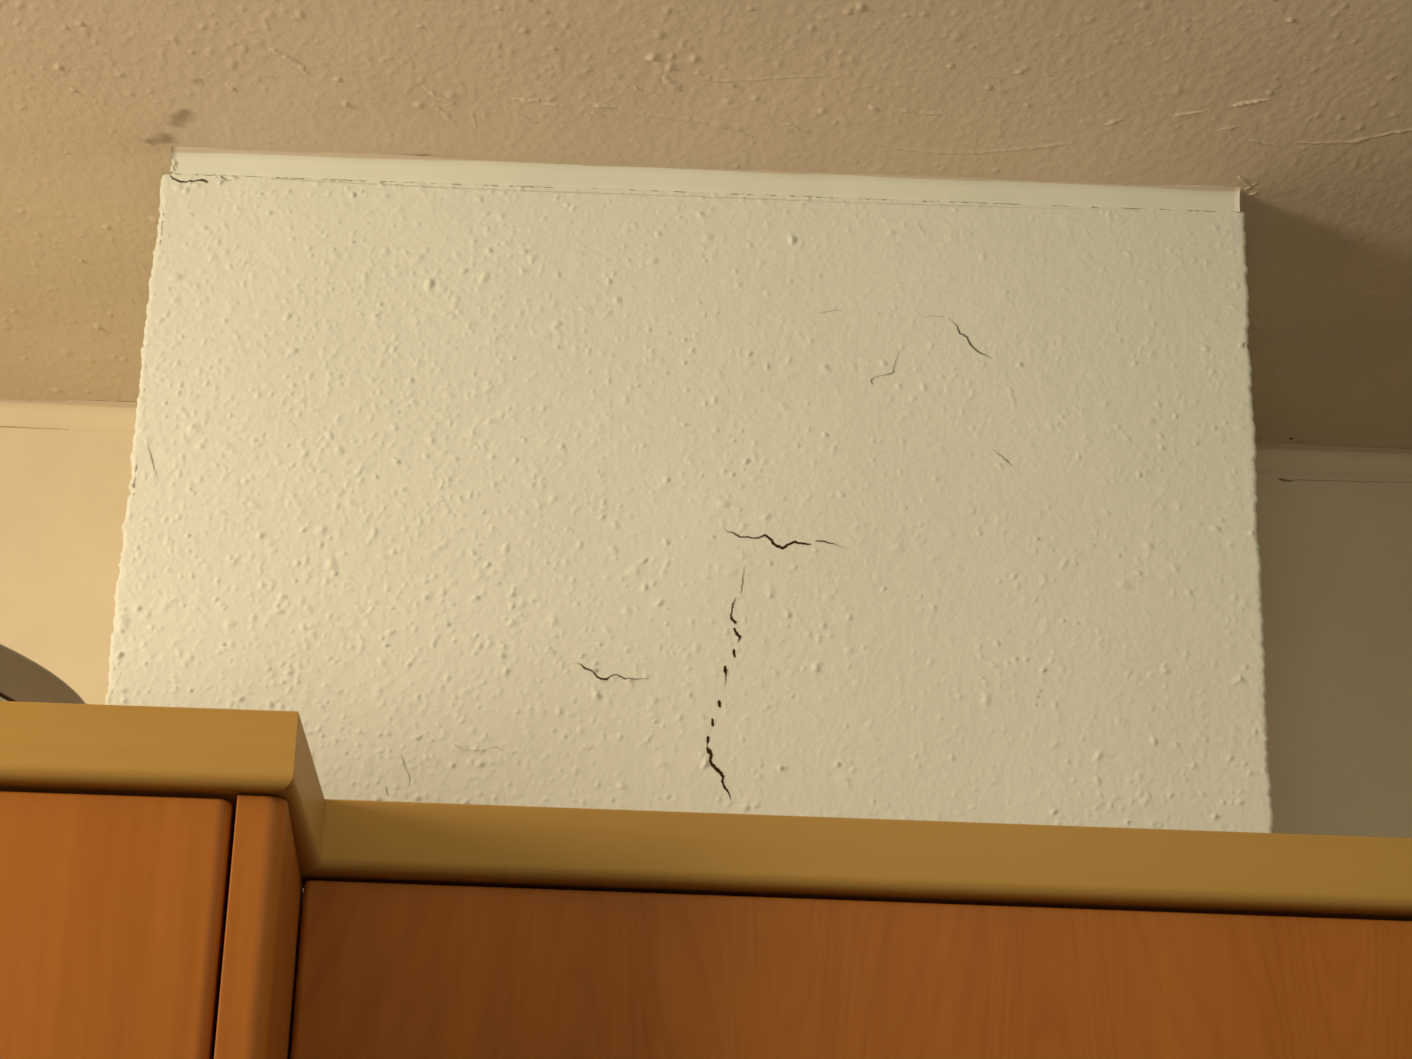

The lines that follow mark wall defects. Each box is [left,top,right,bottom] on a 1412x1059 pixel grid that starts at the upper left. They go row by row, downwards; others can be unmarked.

crack [952,324,990,360]
crack [578,664,642,683]
crack [706,531,837,799]